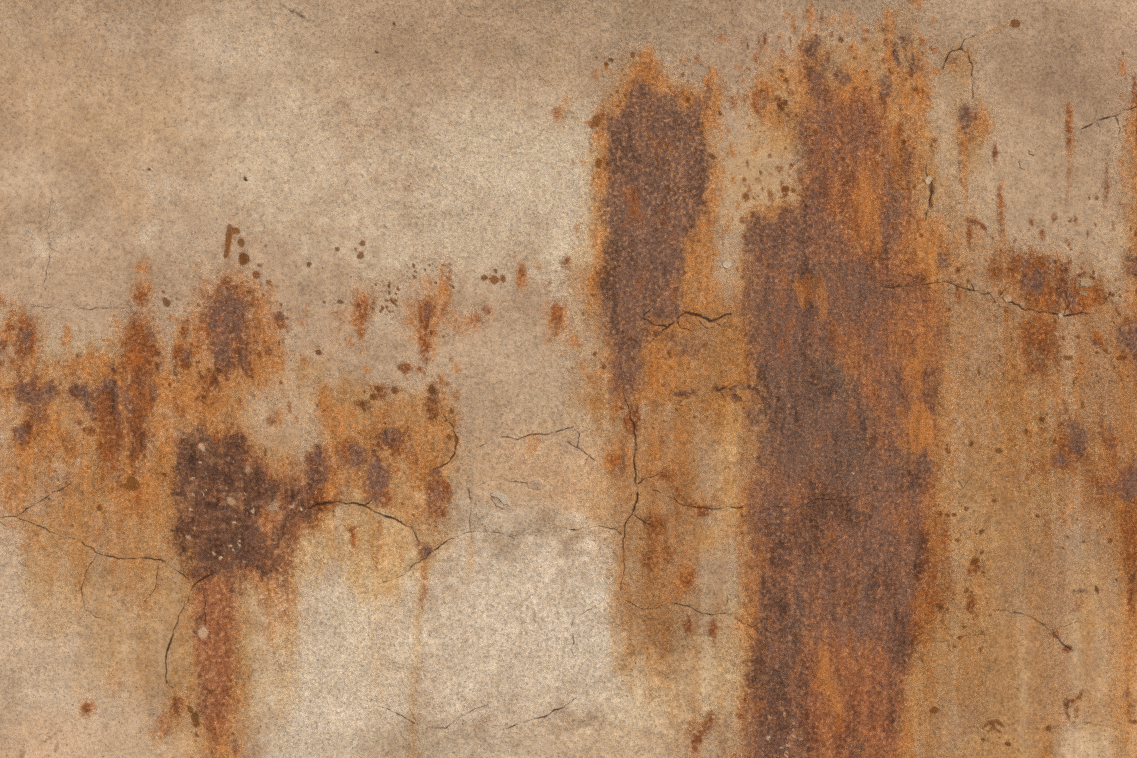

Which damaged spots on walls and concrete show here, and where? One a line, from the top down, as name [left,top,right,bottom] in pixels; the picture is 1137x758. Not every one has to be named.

crack [1,483,71,532]
corrosion [0,317,75,458]
crack [81,541,215,688]
corrosion [69,224,458,758]
crack [289,491,515,582]
crack [570,392,760,634]
corrosion [586,9,992,758]
corrosion [967,219,1137,384]
corrosion [1042,423,1087,469]
corrosion [1091,426,1137,652]